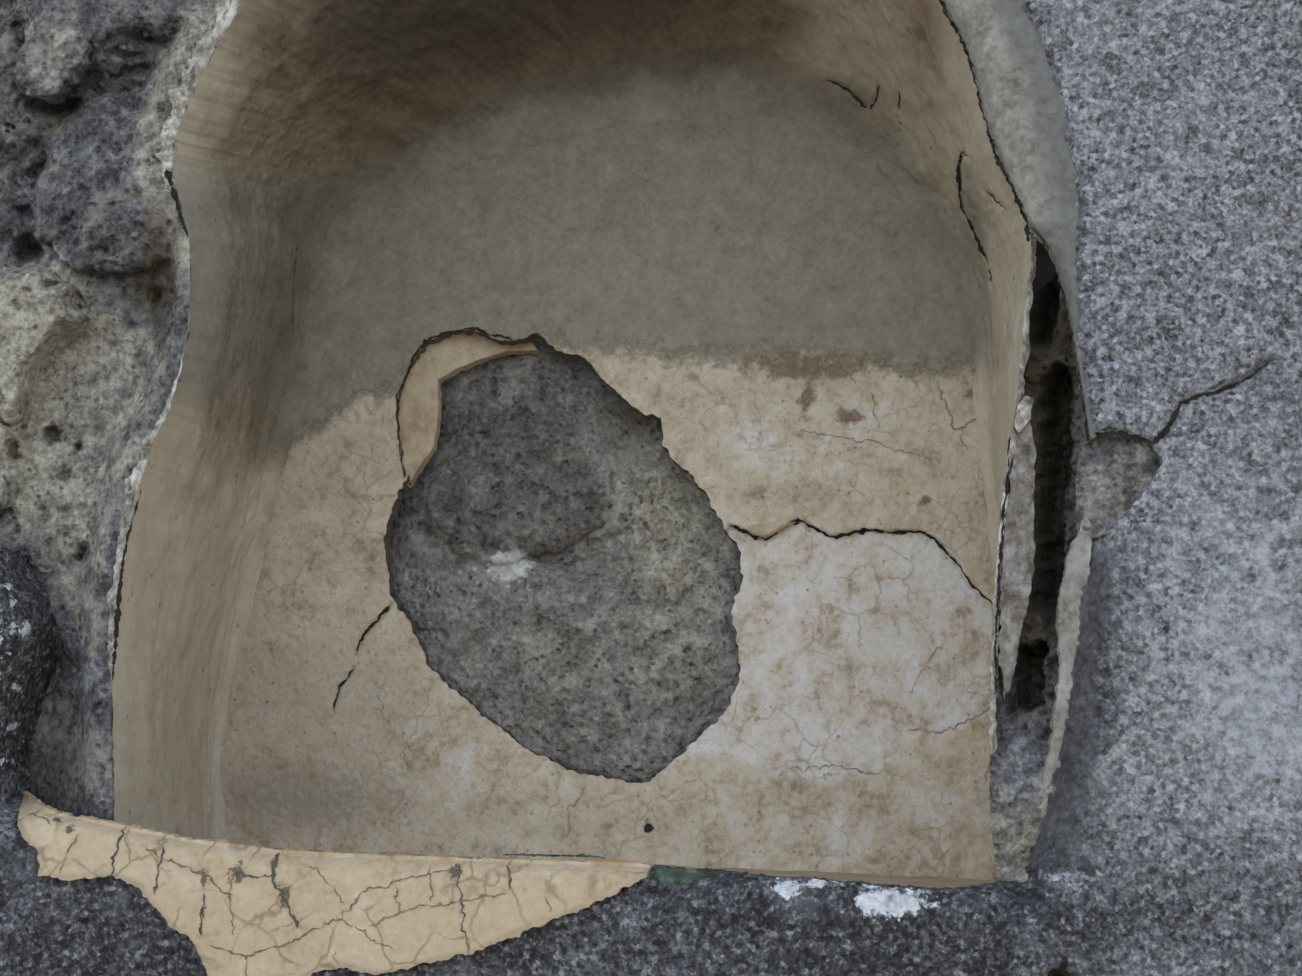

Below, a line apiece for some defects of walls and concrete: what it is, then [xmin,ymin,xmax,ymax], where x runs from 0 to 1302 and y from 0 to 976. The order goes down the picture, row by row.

spalling [155,0,244,242]
crack [827,80,900,110]
crack [939,0,1030,281]
spalling [105,306,190,704]
crack [333,604,391,710]
spalling [396,327,540,488]
crack [730,437,1010,734]
spalling [988,235,1037,757]
spalling [1075,429,1160,539]
crack [1095,360,1270,445]
crack [377,695,408,816]
peeling [17,791,652,976]